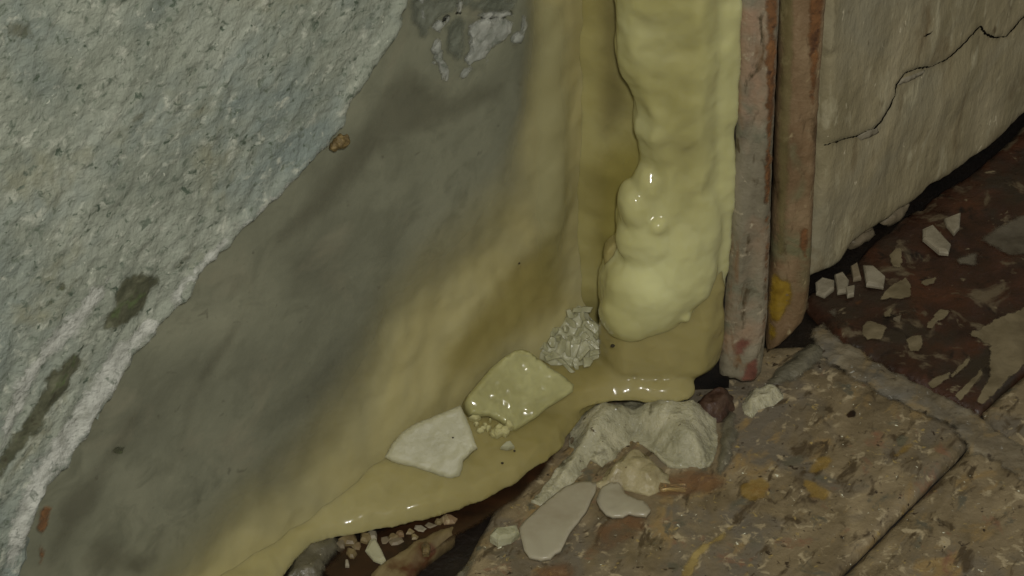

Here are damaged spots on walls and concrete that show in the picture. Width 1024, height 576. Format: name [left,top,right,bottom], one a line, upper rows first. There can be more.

peeling [413,0,528,81]
rust [764,0,777,203]
rust [809,0,823,98]
crack [824,16,1024,145]
mould [104,272,159,329]
rust [763,275,791,337]
mould [0,354,81,476]